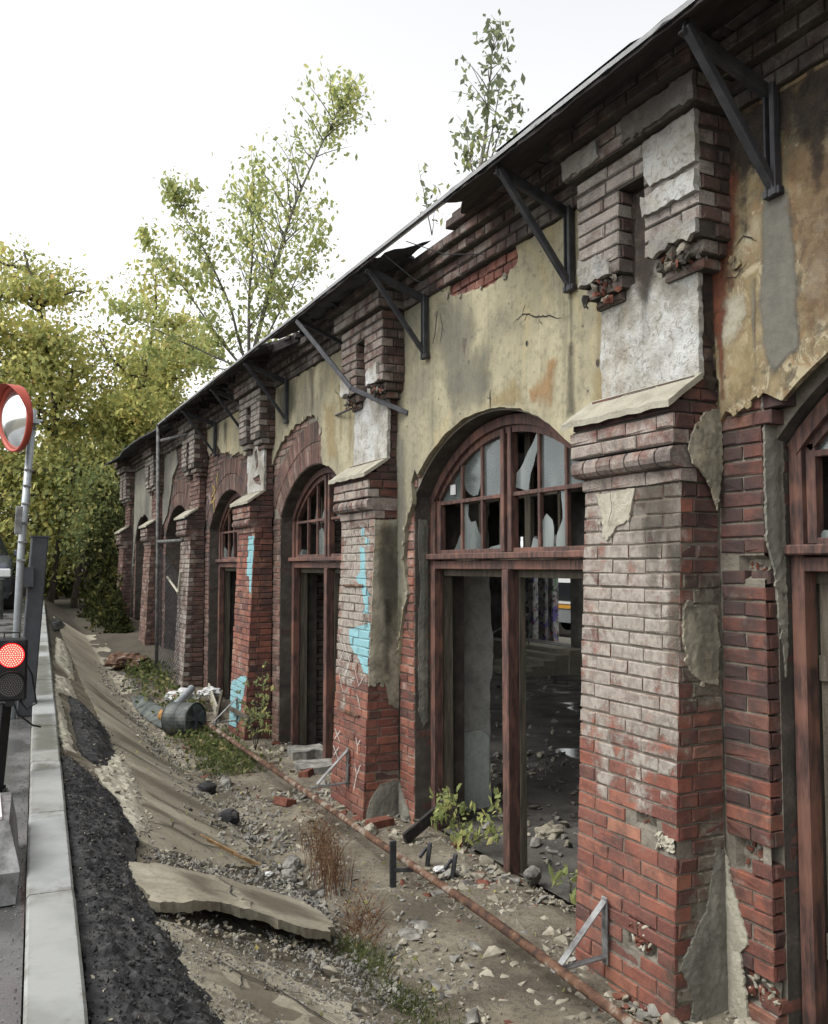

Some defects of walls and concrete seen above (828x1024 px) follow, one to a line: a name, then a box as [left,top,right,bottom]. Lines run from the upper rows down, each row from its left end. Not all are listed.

leakage [779,64,828,177]
spalling [445,249,518,299]
crack [515,306,557,324]
spalling [731,389,769,417]
peeling [751,425,789,678]
peeling [401,501,428,727]
spalling [644,813,676,853]
spalling [745,841,764,864]
spalling [740,967,782,1009]